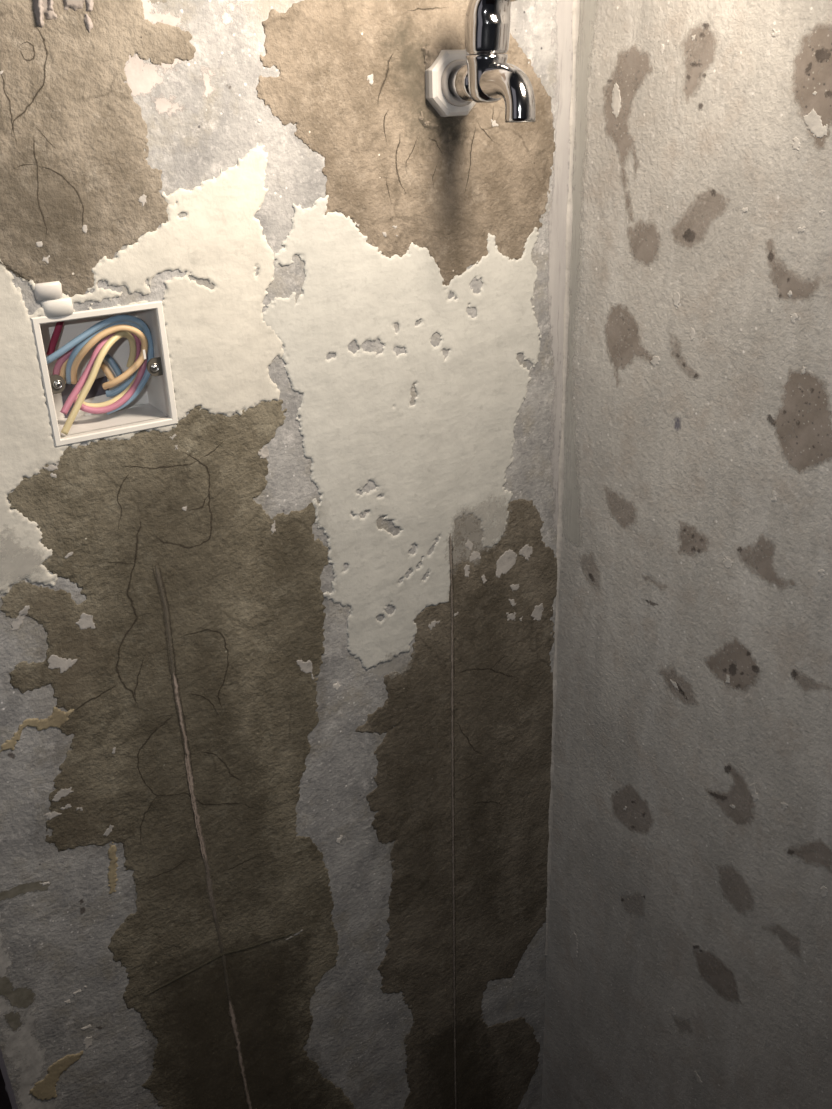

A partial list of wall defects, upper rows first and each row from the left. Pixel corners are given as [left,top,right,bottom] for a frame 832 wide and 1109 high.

crack [0,27,84,232]
peeling [0,0,216,297]
water stain [604,47,659,264]
water stain [795,25,832,147]
water stain [606,305,660,384]
water stain [767,367,832,472]
crack [70,450,261,1109]
peeling [0,399,356,1109]
peeling [355,499,557,1109]
water stain [707,640,759,689]
water stain [153,945,324,1109]